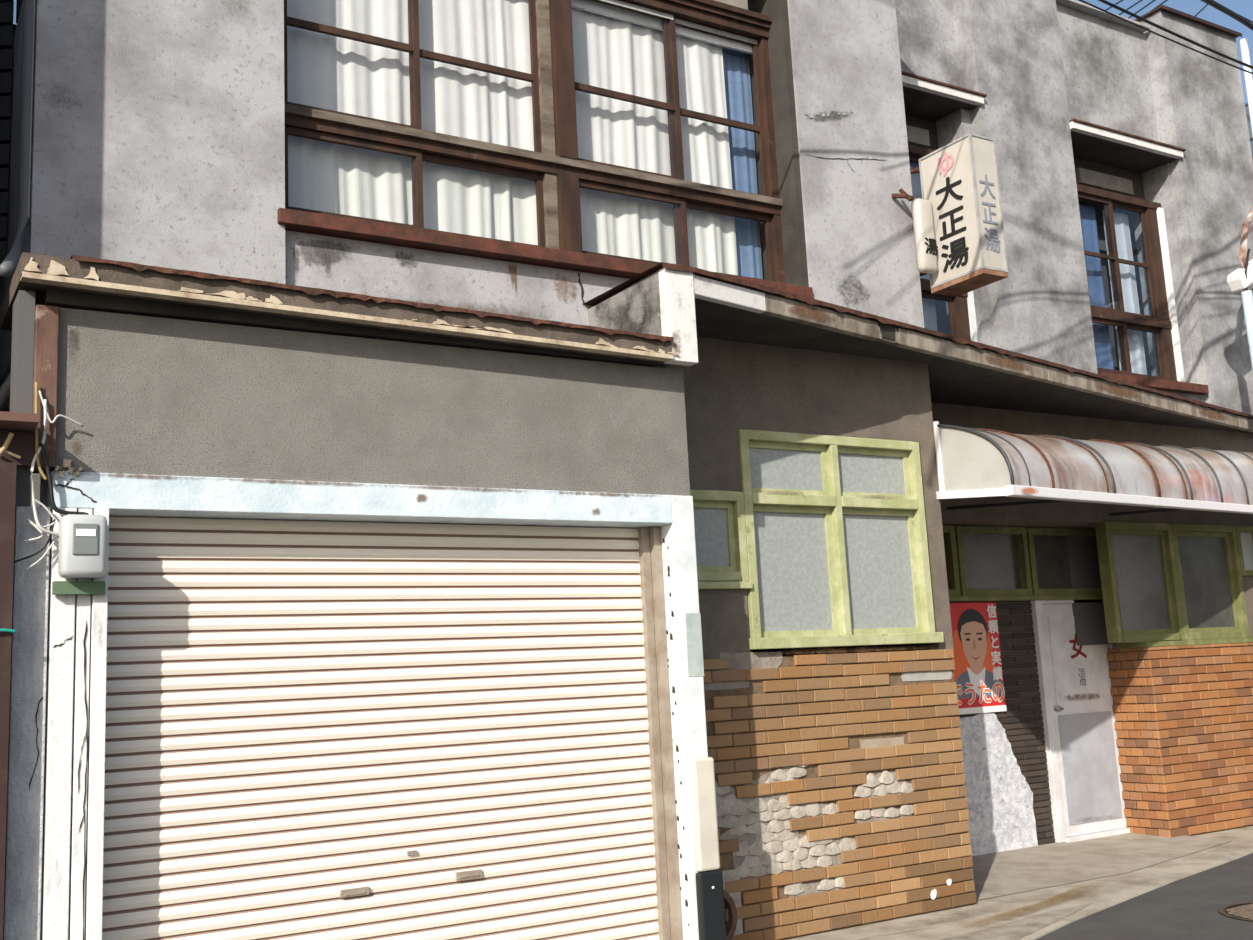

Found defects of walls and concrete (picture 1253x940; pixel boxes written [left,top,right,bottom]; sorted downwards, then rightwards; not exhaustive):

peeling [24,257,99,281]
peeling [178,287,283,304]
peeling [403,319,514,334]
spalling [715,753,915,898]